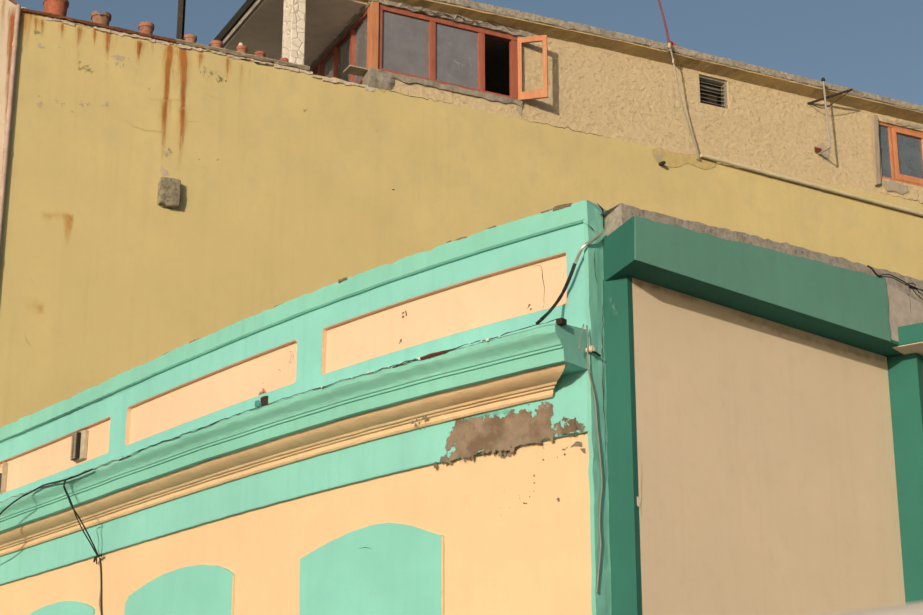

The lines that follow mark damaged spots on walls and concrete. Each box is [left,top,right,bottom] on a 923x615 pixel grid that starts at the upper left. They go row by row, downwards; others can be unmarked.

corrosion [7,13,27,72]
corrosion [163,46,187,139]
peeling [433,401,586,468]